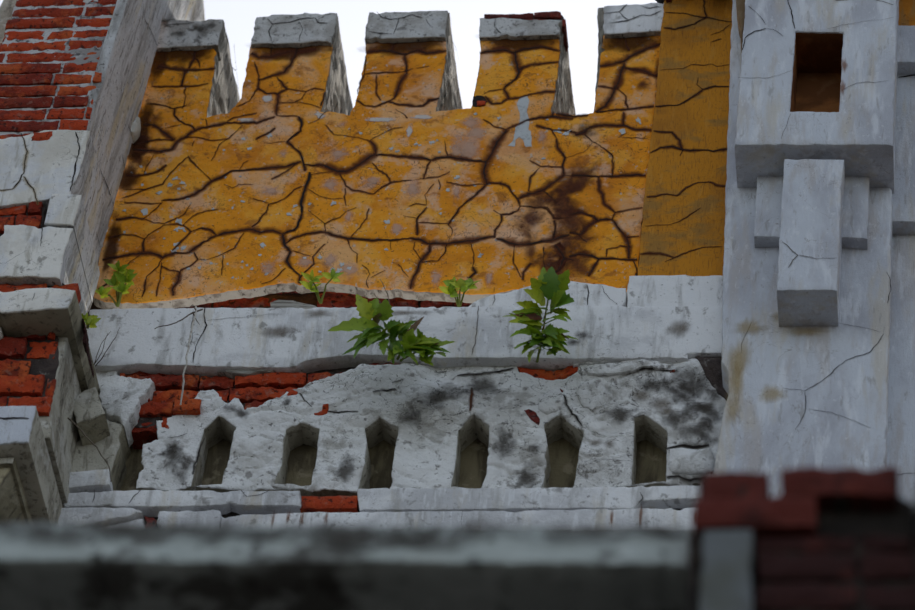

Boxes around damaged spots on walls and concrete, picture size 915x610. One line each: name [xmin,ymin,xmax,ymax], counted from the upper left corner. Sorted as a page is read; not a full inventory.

peeling [508,96,572,147]
crack [70,0,795,305]
crack [0,133,43,264]
peeling [299,255,357,274]
crack [434,298,514,411]
spalling [517,359,676,392]
crack [602,368,672,376]
spalling [695,356,728,401]
spalling [120,367,356,449]
crack [300,393,358,414]
spalling [524,409,540,425]
crack [563,394,582,426]